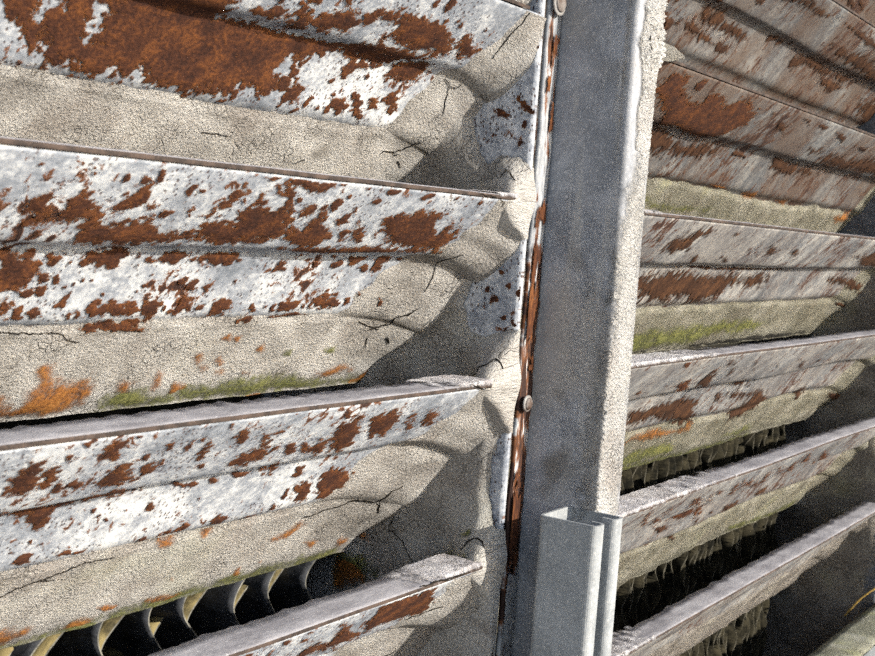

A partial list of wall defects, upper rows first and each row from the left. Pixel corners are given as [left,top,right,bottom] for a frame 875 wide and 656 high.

rust [3,0,488,120]
crack [492,13,530,59]
crack [480,169,515,207]
rust [0,169,463,334]
crack [359,255,462,347]
rust [637,223,799,304]
water stain [675,331,812,349]
rust [228,406,440,511]
rust [0,435,219,566]
crack [303,486,413,561]
crack [421,572,470,587]
rust [283,587,439,656]